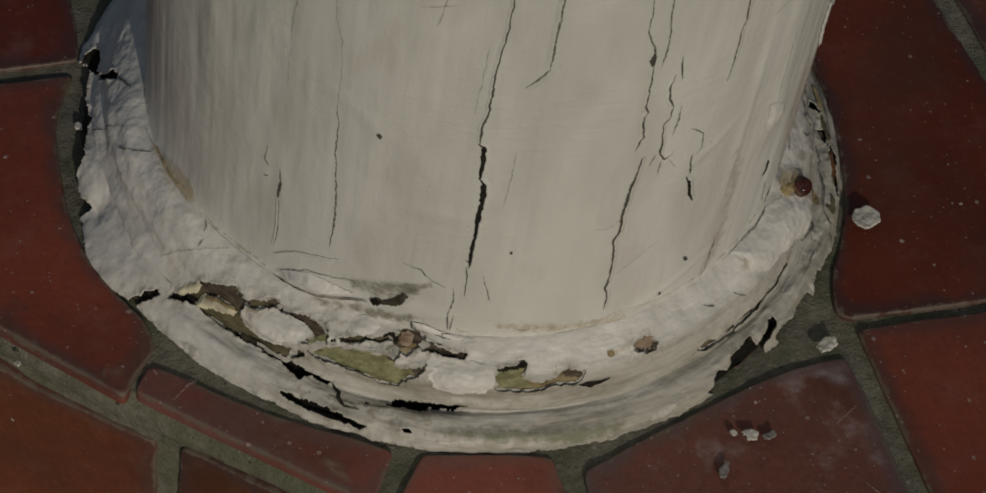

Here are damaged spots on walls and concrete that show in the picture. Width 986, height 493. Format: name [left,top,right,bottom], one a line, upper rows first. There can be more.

crack [264,107,357,282]
crack [404,0,515,330]
crack [603,0,704,310]
peeling [801,68,836,275]
peeling [223,375,255,395]
peeling [132,280,467,386]
spalling [282,391,365,426]
spalling [386,399,461,412]
peeling [434,438,476,448]
peeling [494,360,610,393]
spalling [714,319,776,383]
peeling [698,265,795,351]